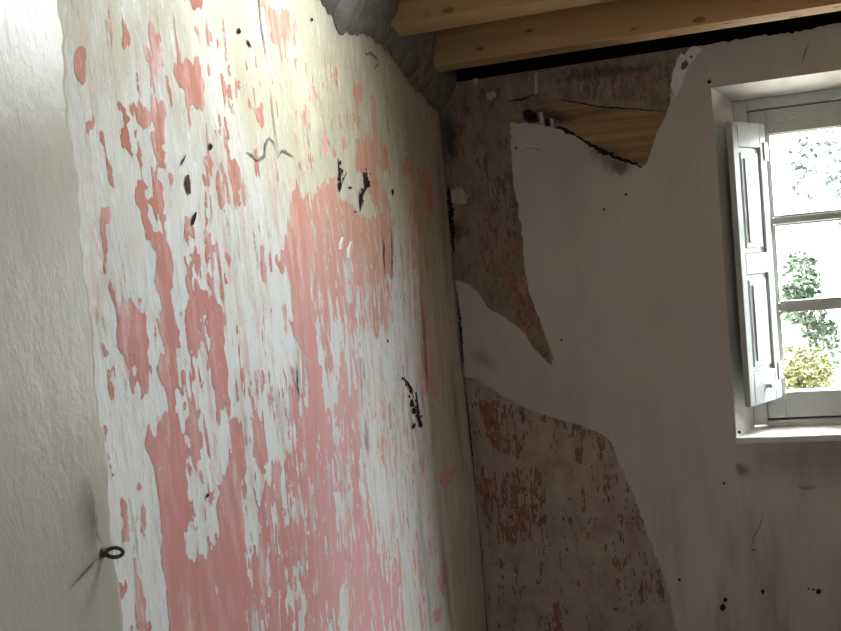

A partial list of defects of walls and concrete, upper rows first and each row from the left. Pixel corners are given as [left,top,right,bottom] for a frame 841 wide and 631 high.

peeling [74,46,87,85]
peeling [86,116,114,187]
crack [246,86,294,161]
peeling [100,0,701,631]